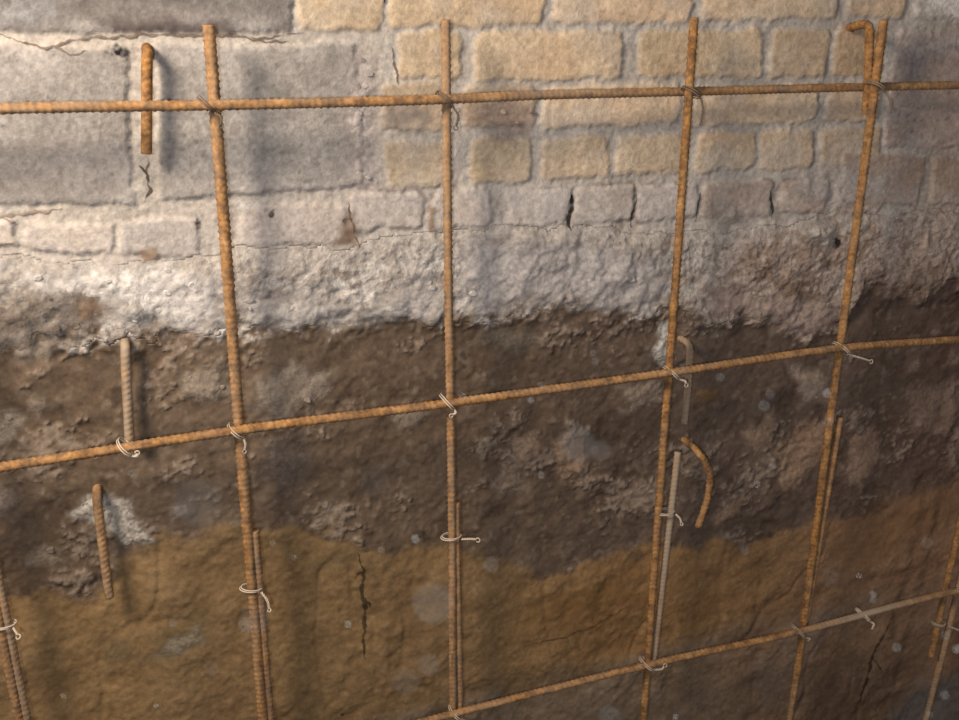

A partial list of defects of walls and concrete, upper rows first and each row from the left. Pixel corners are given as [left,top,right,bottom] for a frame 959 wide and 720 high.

damp [914,0,959,19]
crack [1,32,298,55]
crack [391,48,399,83]
crack [138,162,152,198]
crack [342,202,360,248]
crack [566,194,574,230]
damp [26,249,218,329]
damp [242,281,443,326]
damp [711,289,833,334]
damp [653,322,675,366]
crack [357,553,371,658]
crack [853,613,895,713]